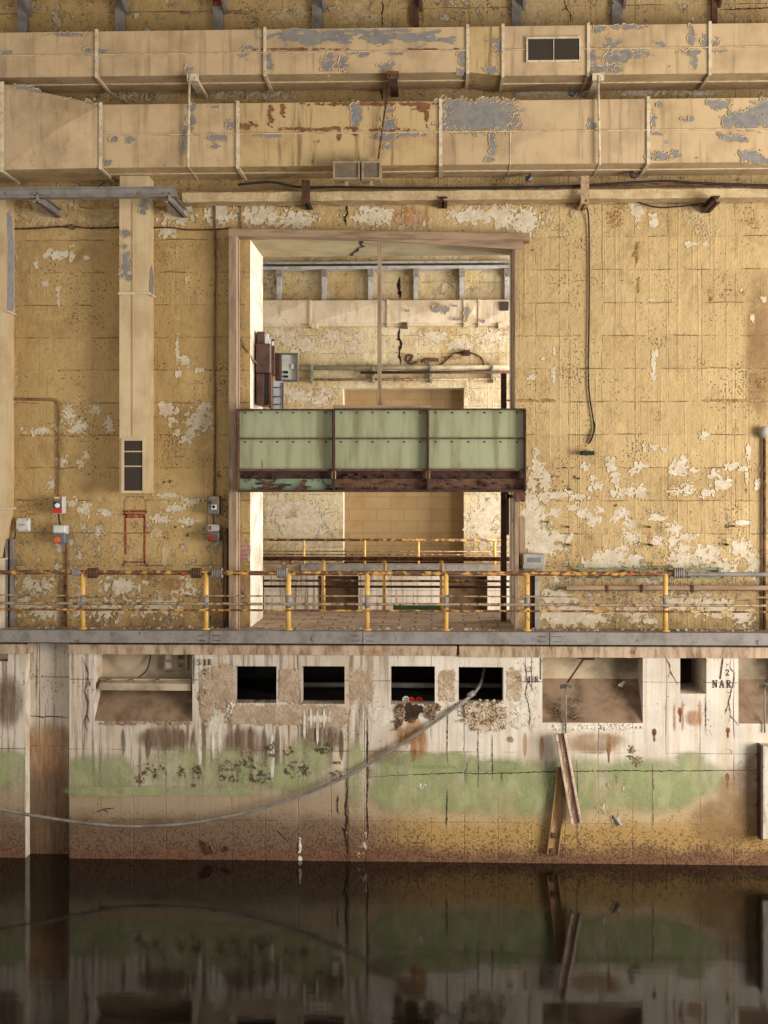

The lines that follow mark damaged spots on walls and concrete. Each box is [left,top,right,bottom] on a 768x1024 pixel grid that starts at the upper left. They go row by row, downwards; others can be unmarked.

rust [239,98,446,141]
peeling [138,199,328,242]
crack [395,328,403,364]
peeling [463,440,763,572]
peeling [15,492,204,627]
peeling [540,588,763,629]
crack [705,663,739,726]
damp [134,709,344,786]
rust [399,722,426,759]
damp [576,735,617,754]
damp [30,731,69,848]
crack [337,712,757,855]